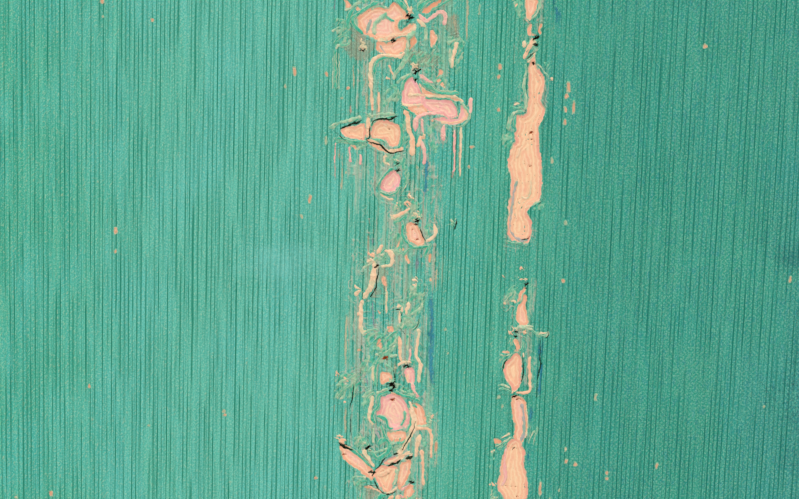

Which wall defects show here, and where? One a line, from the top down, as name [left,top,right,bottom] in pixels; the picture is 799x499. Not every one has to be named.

peeling [497,0,554,245]
peeling [324,0,475,499]
peeling [489,266,560,499]